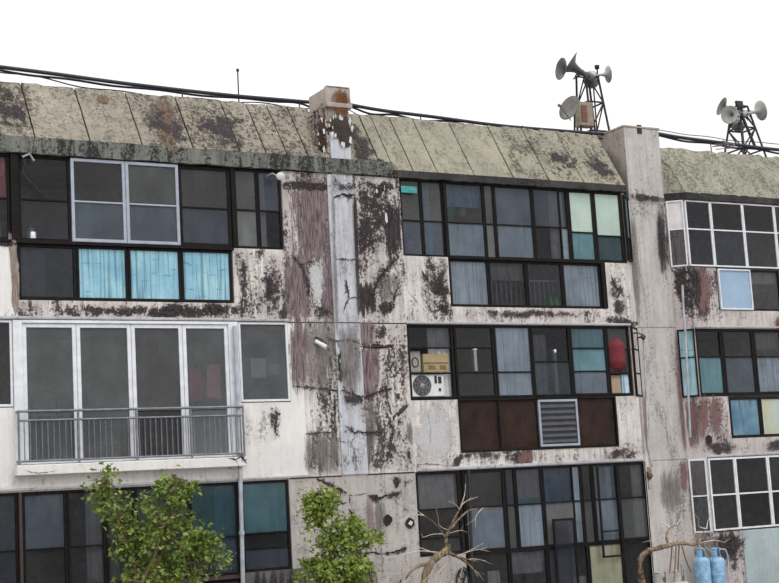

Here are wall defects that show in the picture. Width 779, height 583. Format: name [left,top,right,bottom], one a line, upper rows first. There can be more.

rust [332,90,351,117]
leakage [143,105,253,151]
leakage [350,124,398,172]
mould [53,303,250,318]
leakage [240,256,248,293]
leakage [260,175,403,475]
leakage [426,258,451,315]
leakage [631,194,711,316]